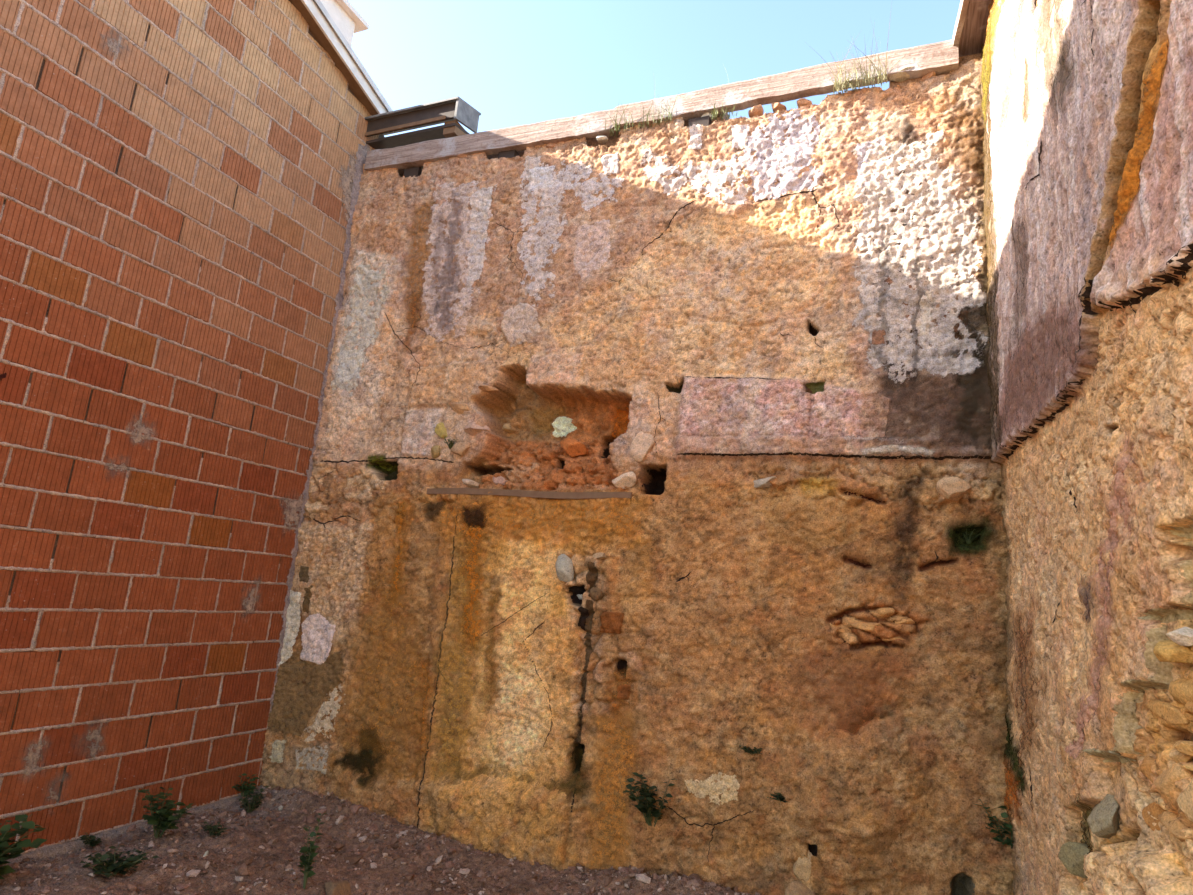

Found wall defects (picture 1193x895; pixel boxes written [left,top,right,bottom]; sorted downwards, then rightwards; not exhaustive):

peeling [422,180,498,342]
peeling [501,153,624,347]
spalling [611,109,830,365]
peeling [850,130,989,384]
spalling [463,364,630,491]
peeling [813,390,933,455]
crack [417,514,458,828]
spalling [1061,440,1193,895]